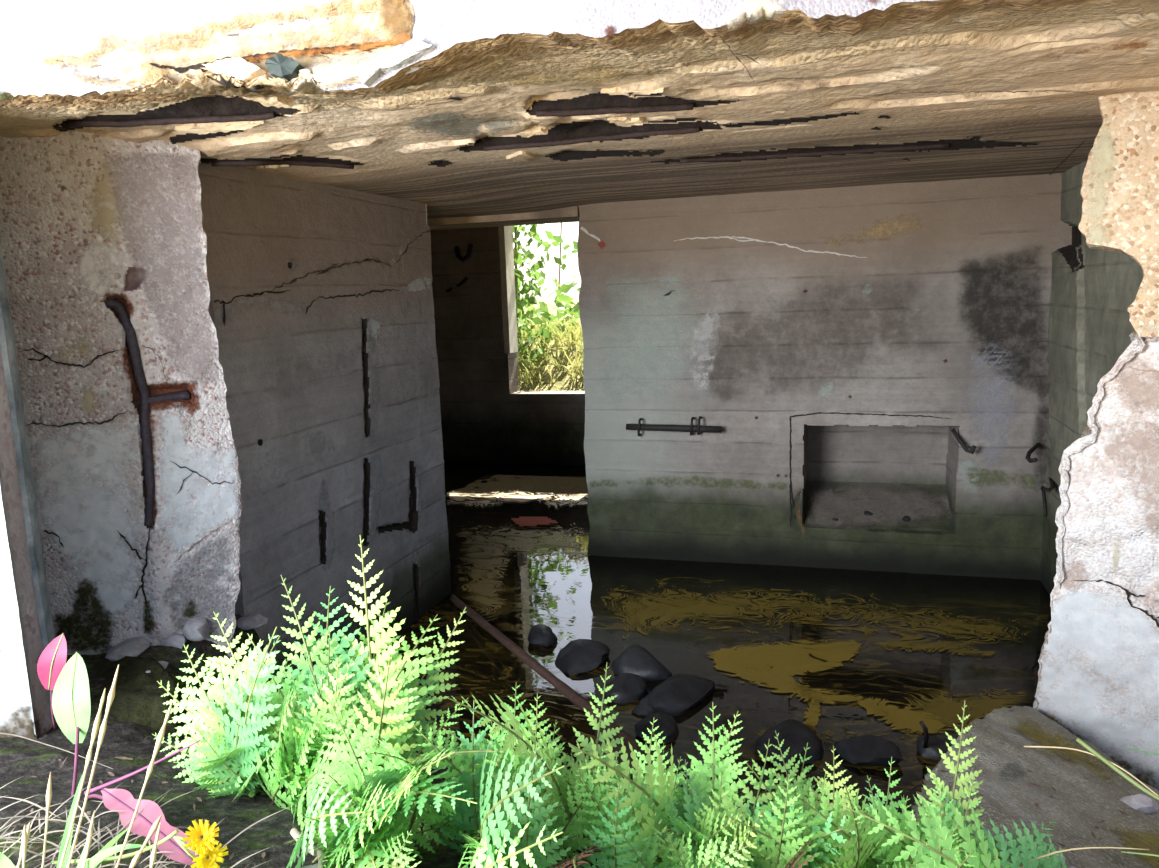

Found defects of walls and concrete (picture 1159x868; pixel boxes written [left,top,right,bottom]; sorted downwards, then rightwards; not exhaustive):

spalling [36,0,436,144]
spalling [457,87,1038,164]
crack [675,236,867,258]
crack [21,345,168,381]
damp [963,257,1049,474]
crack [214,230,430,623]
crack [117,519,233,608]
crack [1074,579,1159,628]
peeling [1040,592,1159,789]